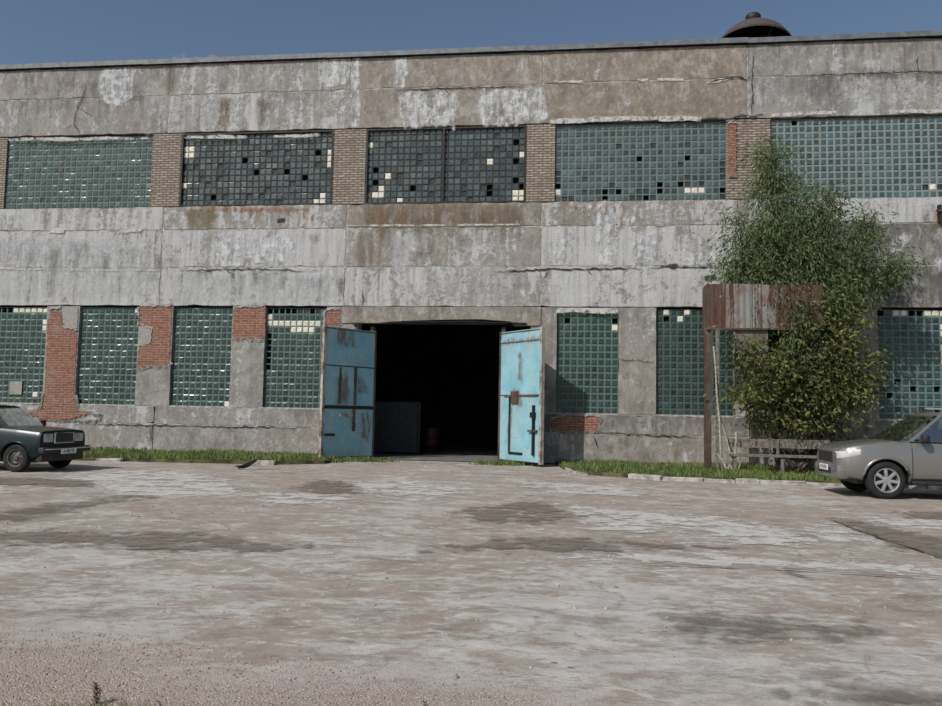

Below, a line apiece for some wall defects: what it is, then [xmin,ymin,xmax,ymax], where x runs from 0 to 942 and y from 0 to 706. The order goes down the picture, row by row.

leakage [99,67,135,106]
leakage [395,59,459,129]
leakage [478,88,548,126]
flaking render [9,305,104,424]
flaking render [137,302,173,371]
flaking render [548,412,604,435]